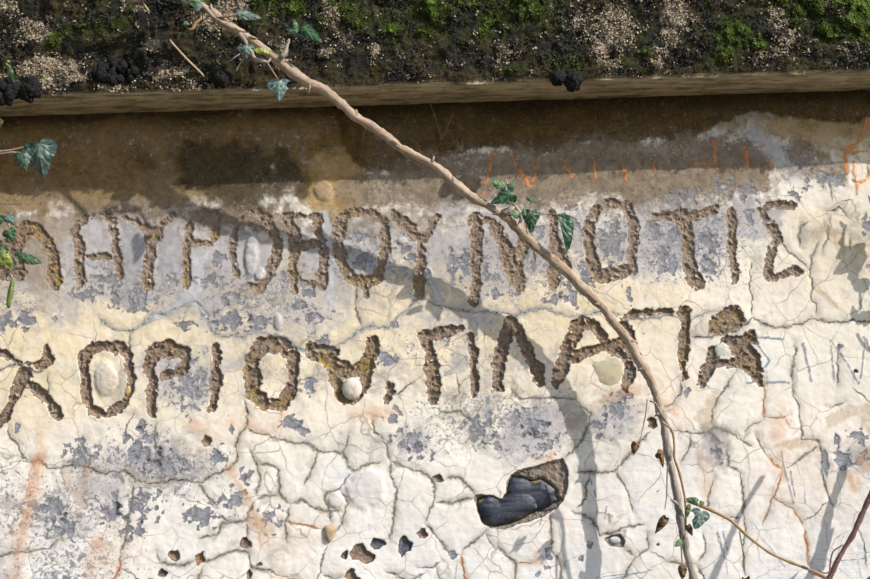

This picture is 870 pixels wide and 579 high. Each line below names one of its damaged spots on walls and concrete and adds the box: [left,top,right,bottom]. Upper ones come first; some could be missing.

leakage [0,90,870,314]
crack [0,363,50,399]
crack [100,192,870,579]
crack [0,401,533,579]
spalling [168,550,180,561]
spalling [240,537,252,548]
spalling [341,538,386,579]
spalling [398,528,428,558]